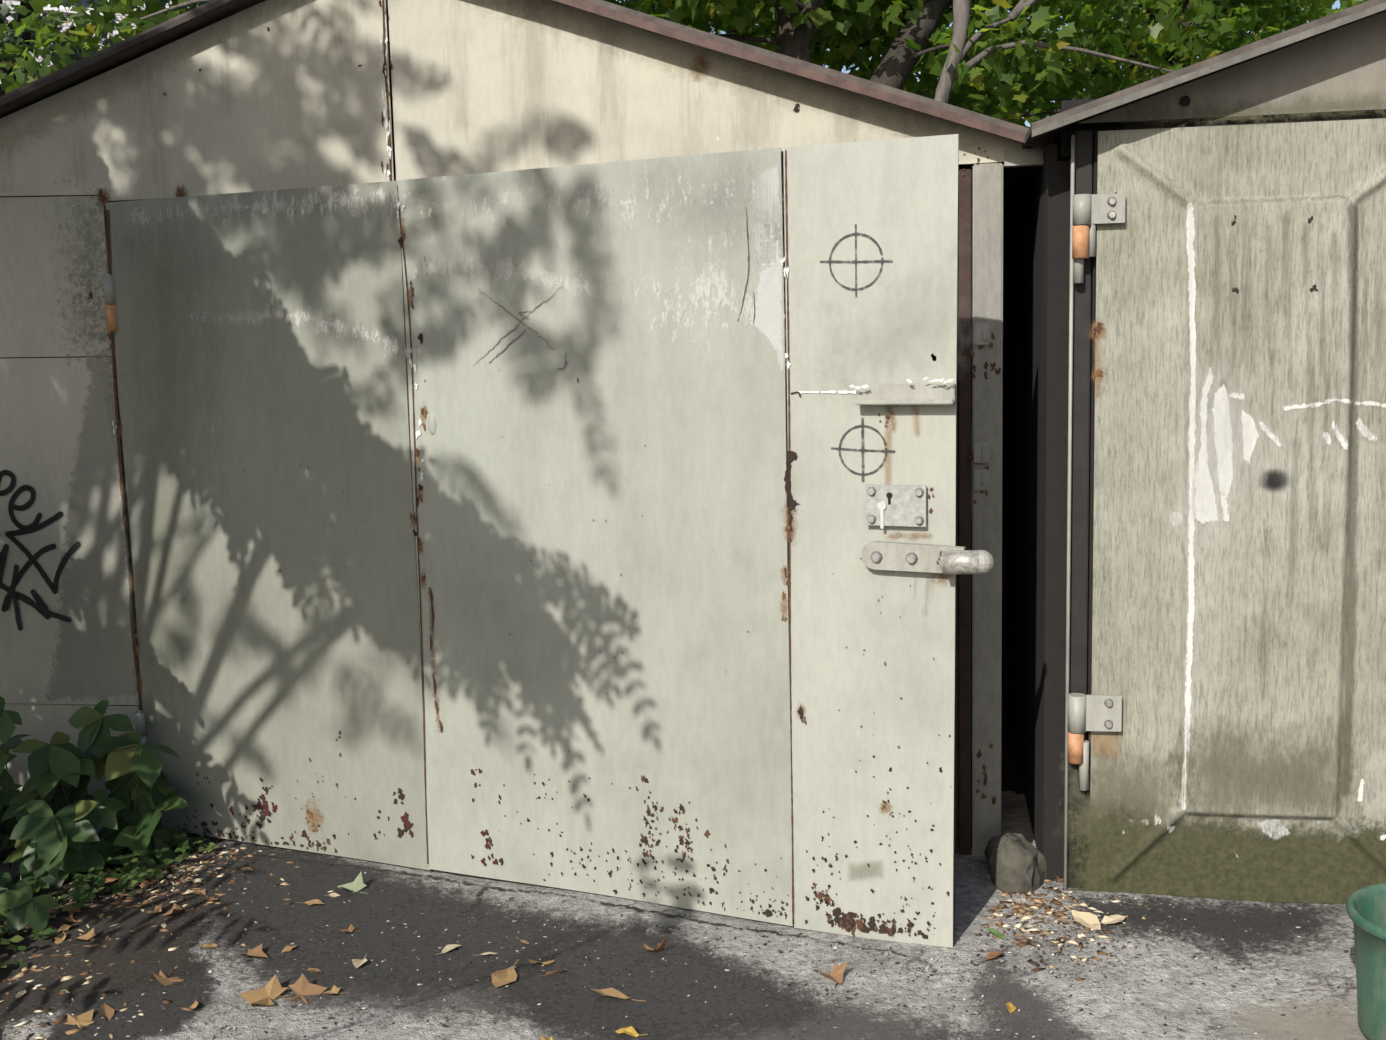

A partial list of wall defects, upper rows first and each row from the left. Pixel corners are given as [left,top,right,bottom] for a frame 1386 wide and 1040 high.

corrosion [780,150,791,451]
corrosion [397,187,443,864]
corrosion [781,518,807,924]
crack [0,993,83,1032]
crack [0,832,907,957]